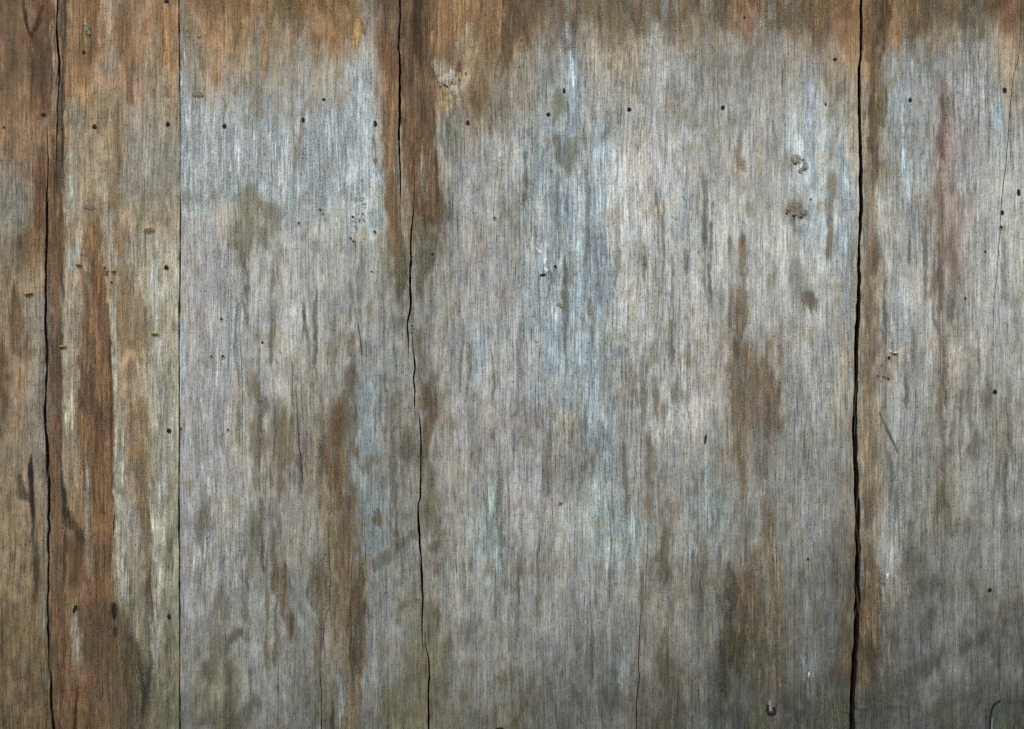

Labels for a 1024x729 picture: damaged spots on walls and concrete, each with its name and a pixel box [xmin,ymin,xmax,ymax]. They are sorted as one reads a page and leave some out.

crack [38,0,61,729]
crack [387,0,430,729]
crack [848,0,867,729]